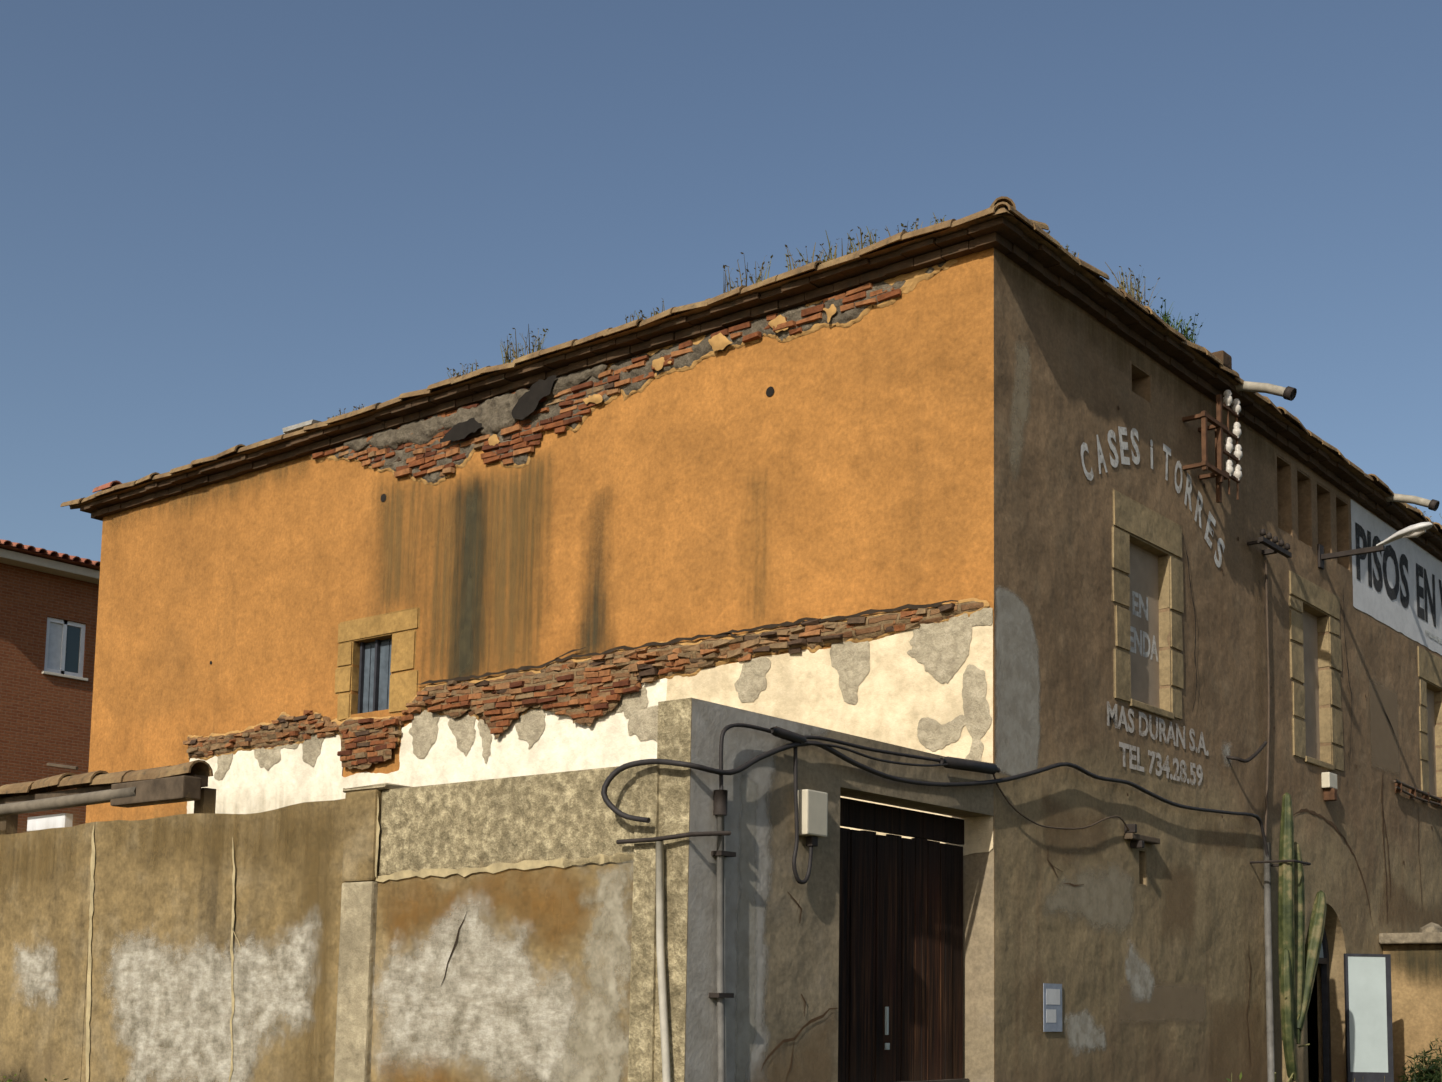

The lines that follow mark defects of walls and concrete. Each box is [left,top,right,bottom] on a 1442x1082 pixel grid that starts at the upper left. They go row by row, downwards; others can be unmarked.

spalling [309,259,958,486]
water stain [431,475,530,683]
water stain [580,570,604,657]
peeling [183,598,993,814]
peeling [840,796,993,856]
crack [441,912,467,985]
crack [761,994,838,1081]